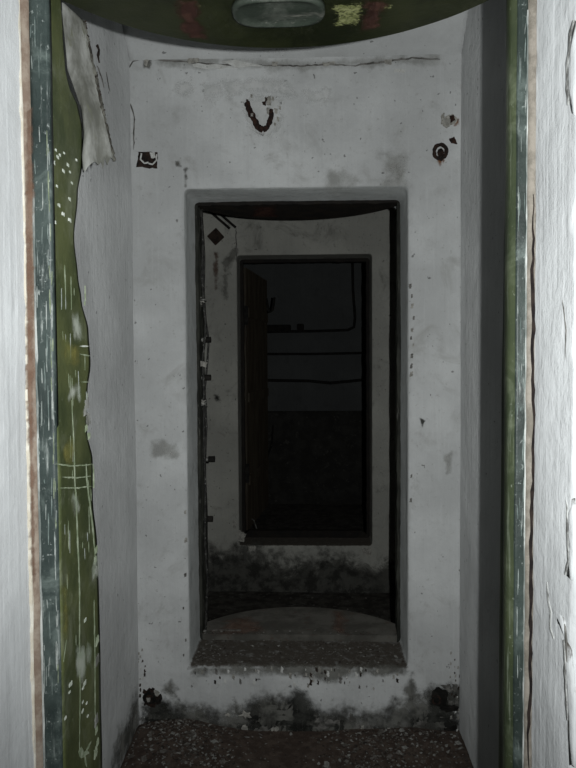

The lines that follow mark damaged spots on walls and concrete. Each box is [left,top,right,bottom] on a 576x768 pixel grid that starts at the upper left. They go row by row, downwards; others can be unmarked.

peeling [61,2,116,173]
crack [129,57,440,73]
crack [128,104,136,150]
spalling [441,113,459,128]
water stain [208,542,382,593]
water stain [112,680,460,768]